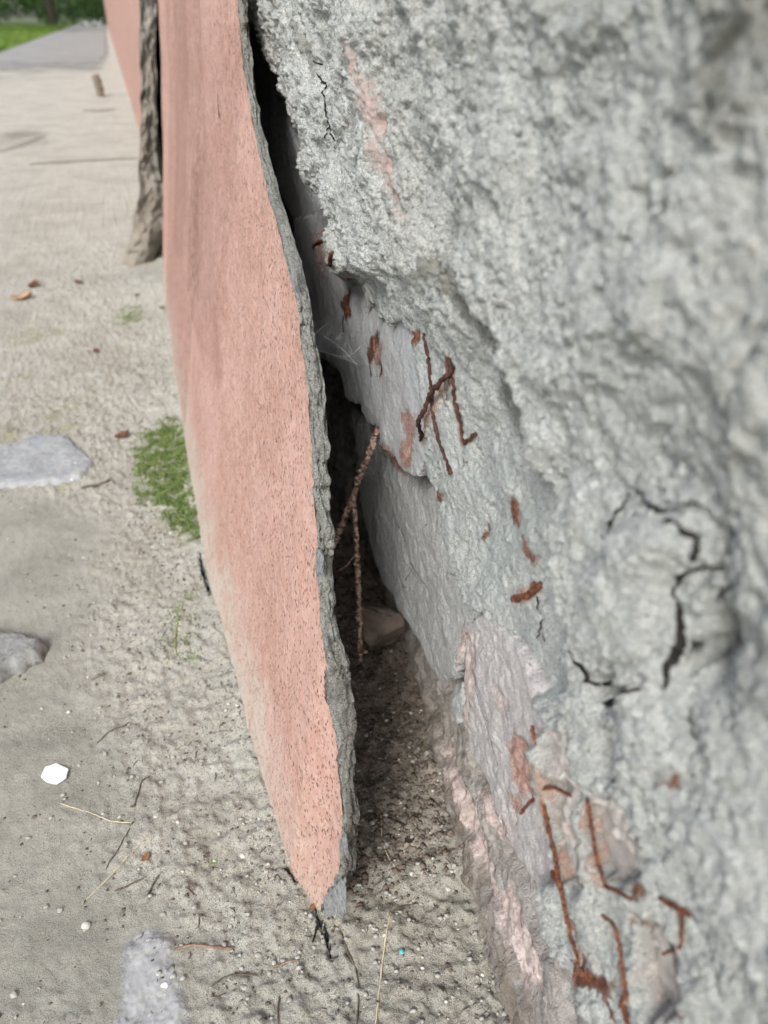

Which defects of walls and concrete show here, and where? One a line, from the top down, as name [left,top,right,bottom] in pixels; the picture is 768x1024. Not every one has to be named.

crack [312,60,336,149]
rust [339,271,355,337]
rust [367,331,382,376]
spalling [237,0,768,1024]
rust [510,497,540,563]
crack [568,486,712,709]
rust [659,774,680,790]
rust [524,756,609,888]
rust [631,881,645,902]
rust [662,897,695,920]
rust [570,919,625,1024]